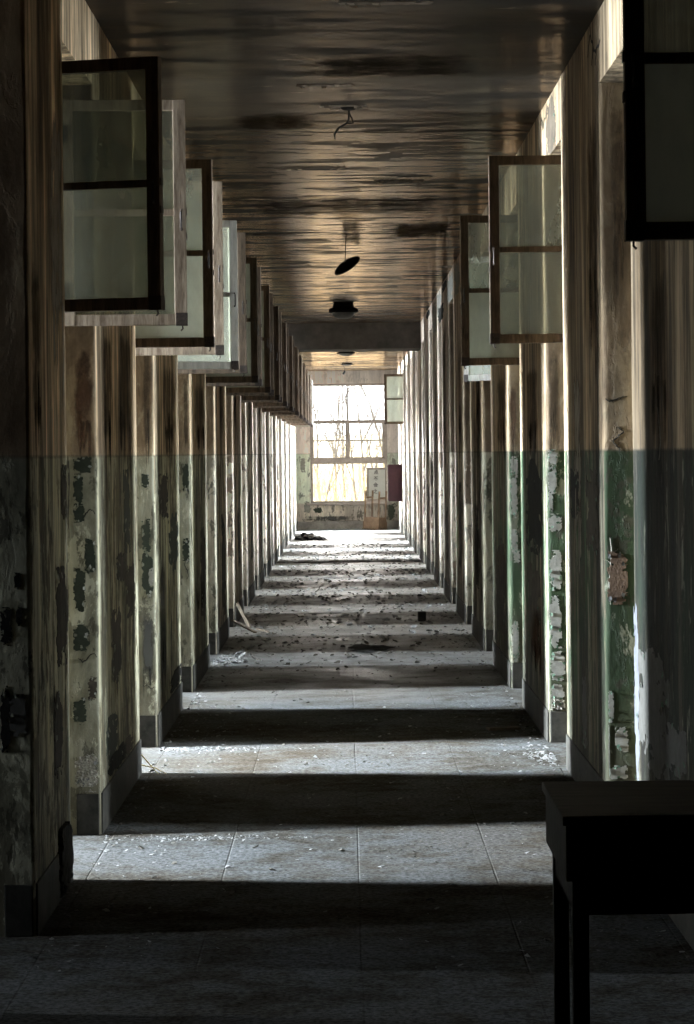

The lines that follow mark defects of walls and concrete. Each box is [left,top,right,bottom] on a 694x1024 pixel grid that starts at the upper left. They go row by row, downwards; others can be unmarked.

leakage [238,115,316,129]
peeling [61,456,92,523]
peeling [56,538,96,667]
peeling [111,469,206,684]
peeling [496,449,687,781]